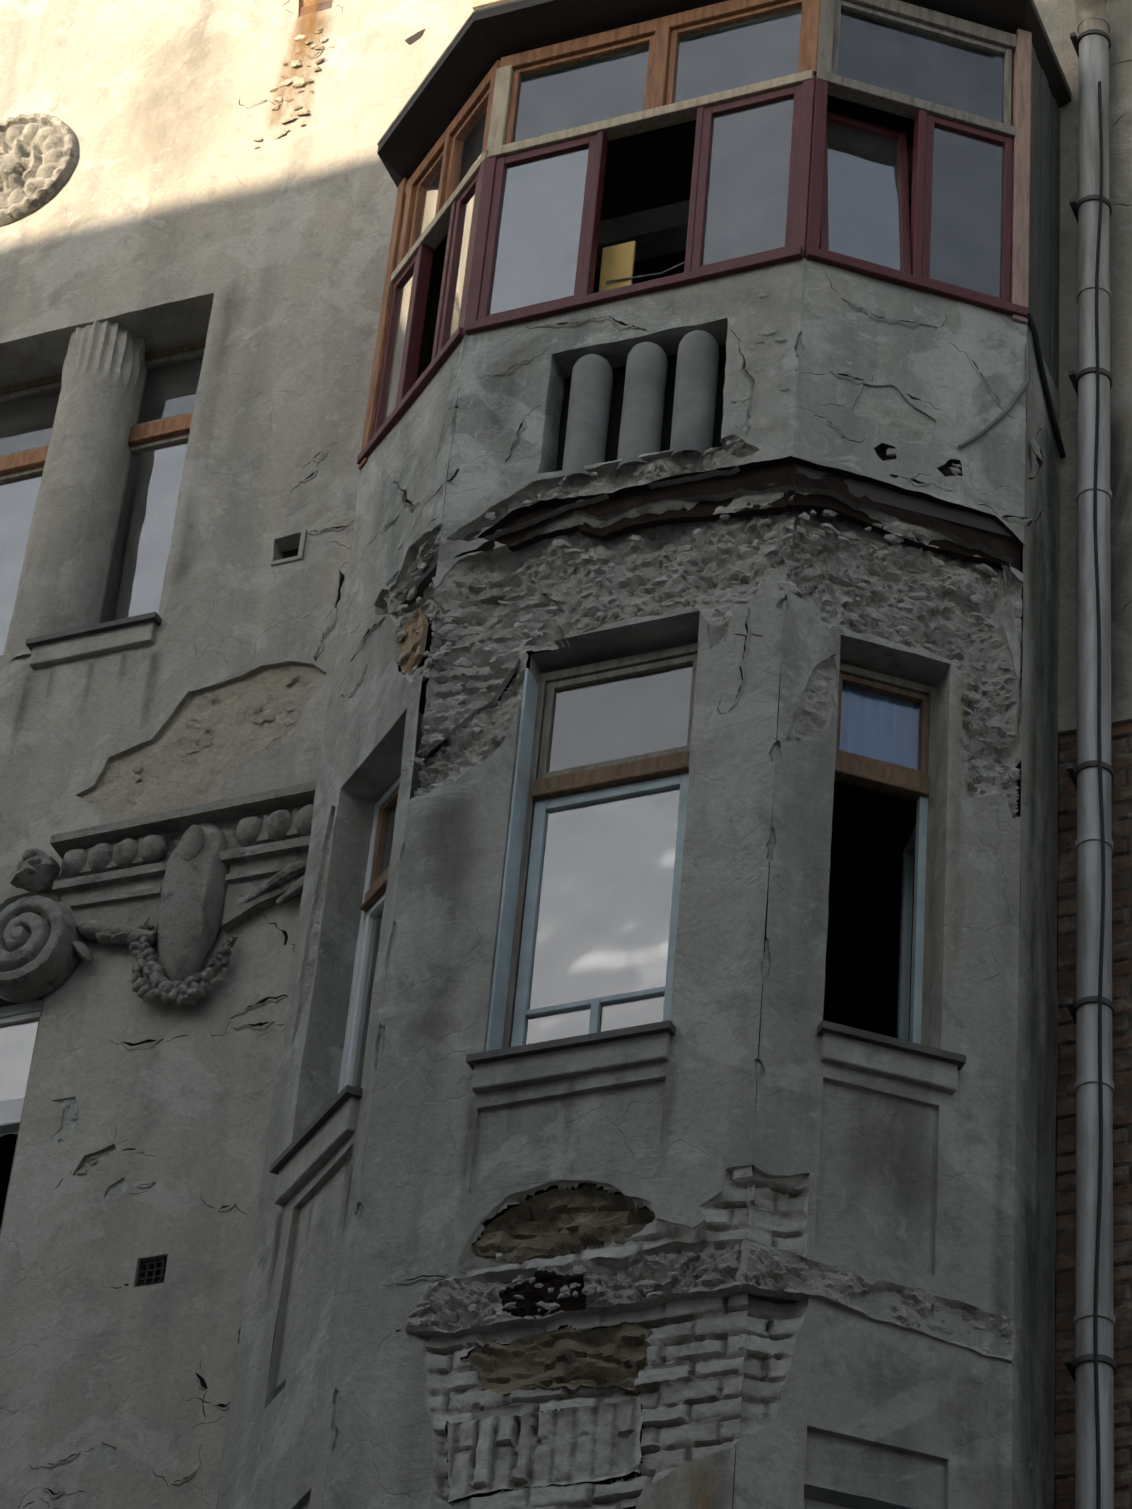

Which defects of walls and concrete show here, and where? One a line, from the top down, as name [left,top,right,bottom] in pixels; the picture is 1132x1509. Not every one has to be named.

flaking render [252,0,328,149]
spalling [794,332,805,358]
crack [796,369,874,443]
peeling [851,383,936,461]
crack [826,275,1044,526]
flaking render [374,434,1024,819]
crack [717,608,763,714]
peeling [76,661,326,818]
crack [114,1126,156,1195]
flaking render [408,1164,810,1509]
crack [17,1448,93,1509]
crack [149,1360,230,1487]